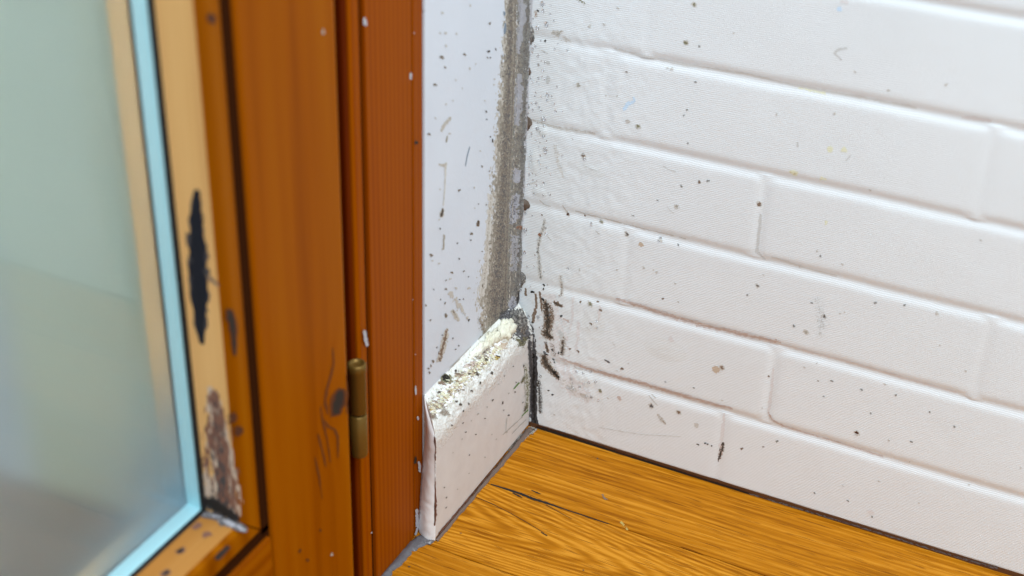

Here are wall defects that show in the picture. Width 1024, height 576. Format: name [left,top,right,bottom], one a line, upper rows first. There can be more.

damp [427,0,998,569]